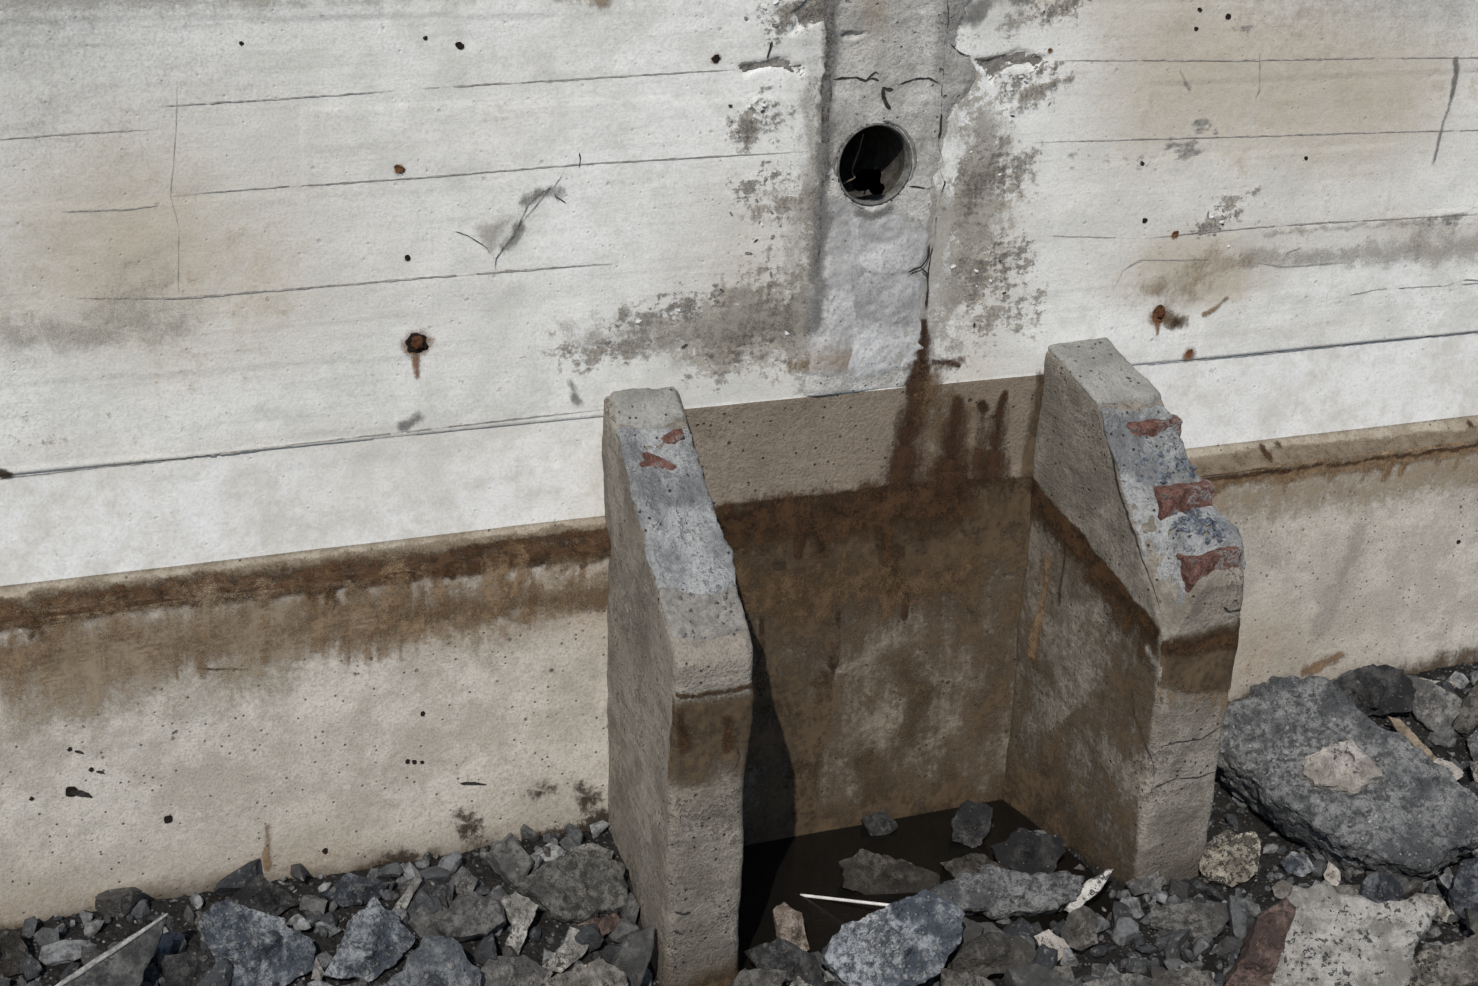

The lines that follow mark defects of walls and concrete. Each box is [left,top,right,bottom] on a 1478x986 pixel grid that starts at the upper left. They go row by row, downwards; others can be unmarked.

peeling [932,52,1074,346]
corrosion [1150,307,1188,329]
spalling [1099,406,1246,607]
leakage [0,530,611,720]
leakage [668,373,1240,884]
leakage [529,780,604,812]